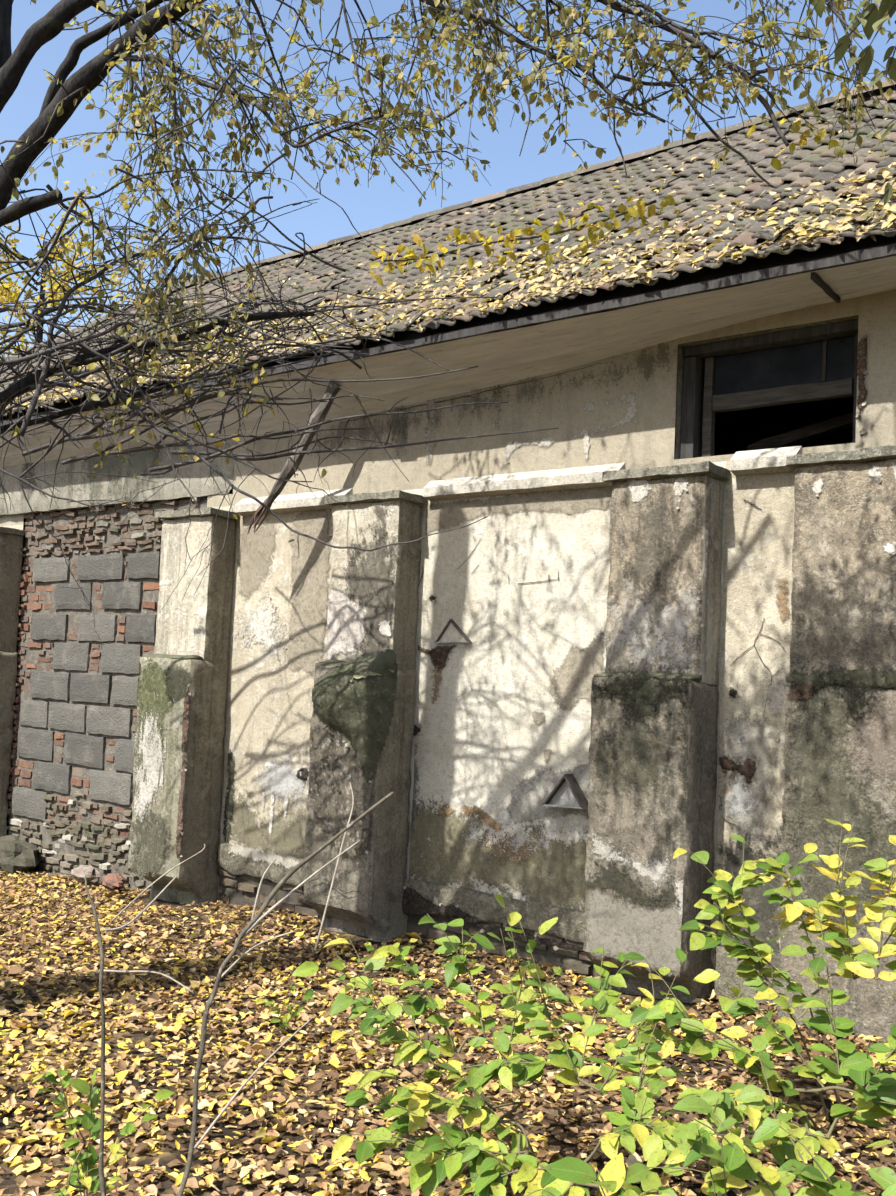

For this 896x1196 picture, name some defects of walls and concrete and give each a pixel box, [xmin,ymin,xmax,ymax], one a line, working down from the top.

damp [343,500,396,658]
corrosion [418,645,456,704]
flaking render [532,630,605,724]
crack [729,621,786,715]
flaking render [507,749,589,823]
corrosion [719,757,757,807]